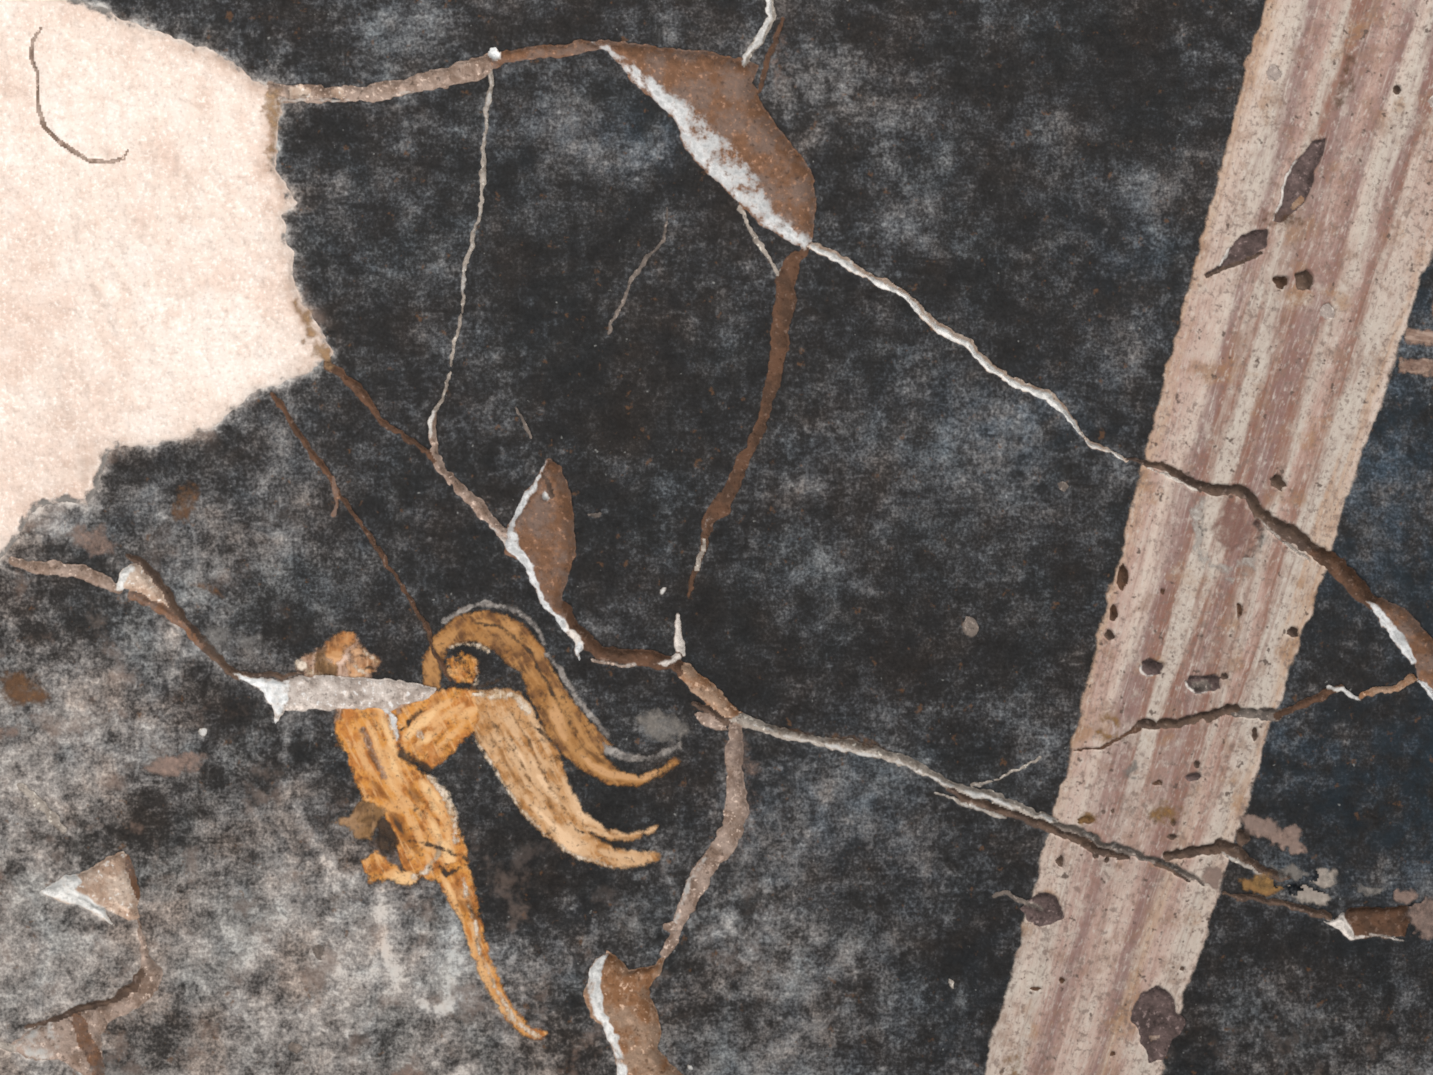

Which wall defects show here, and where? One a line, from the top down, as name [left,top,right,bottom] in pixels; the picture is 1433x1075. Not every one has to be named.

crack [29,27,129,164]
spalling [592,42,816,276]
flaking render [0,0,333,558]
crack [267,39,627,546]
crack [607,208,668,335]
crack [9,554,304,682]
crack [270,392,452,682]
spalling [504,459,602,660]
crack [561,243,1418,958]
spalling [1365,597,1433,700]
spalling [0,851,163,1075]
spalling [583,950,693,1075]